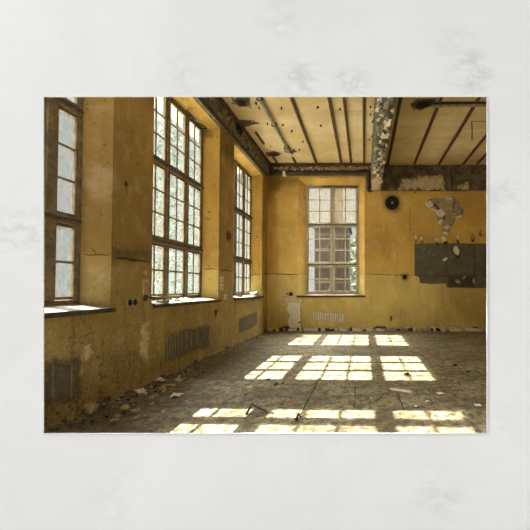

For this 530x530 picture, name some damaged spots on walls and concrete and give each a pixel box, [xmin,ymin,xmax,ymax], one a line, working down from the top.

peeling [219,97,394,191]
crack [84,248,151,269]
peeling [397,175,487,288]
spalling [279,297,303,329]